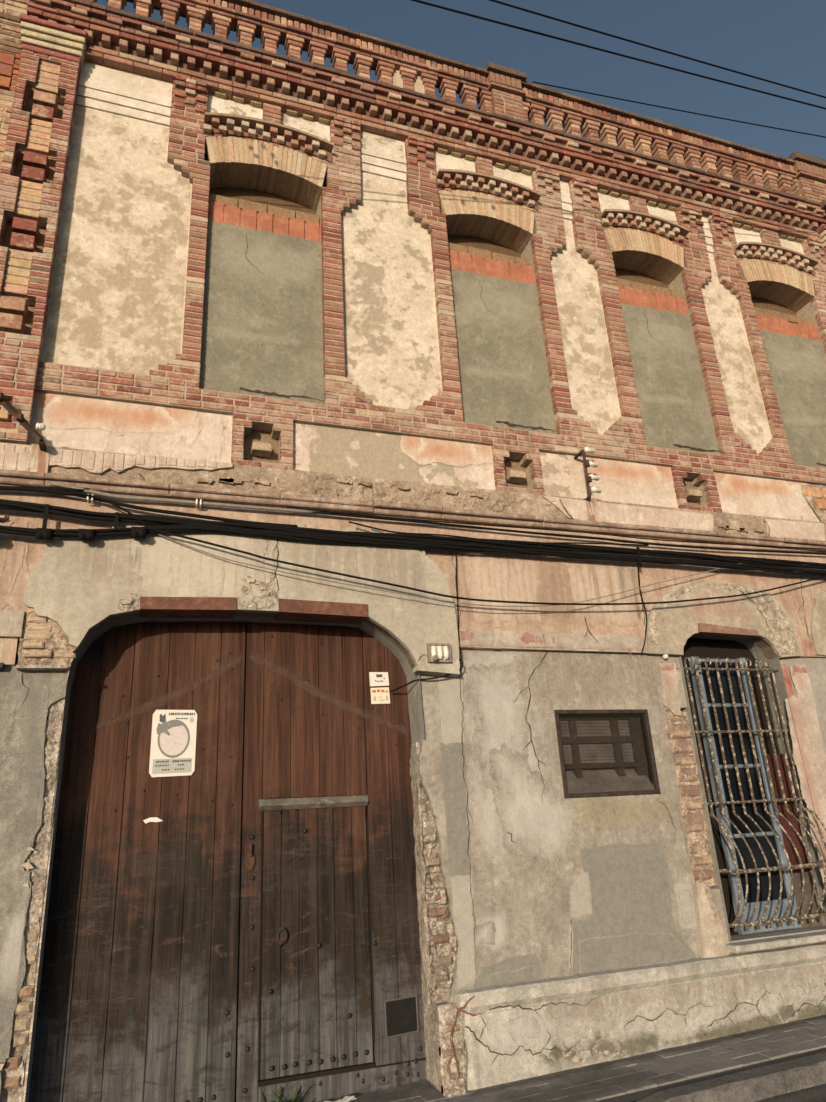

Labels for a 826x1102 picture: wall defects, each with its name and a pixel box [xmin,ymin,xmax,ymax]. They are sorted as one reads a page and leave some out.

peeling [59,423,572,519]
flaking render [801,484,826,523]
spalling [650,583,800,655]
spalling [1,608,77,1102]
spalling [410,741,469,1098]
crack [418,651,604,1083]
spalling [665,710,720,925]
crack [624,978,826,1036]